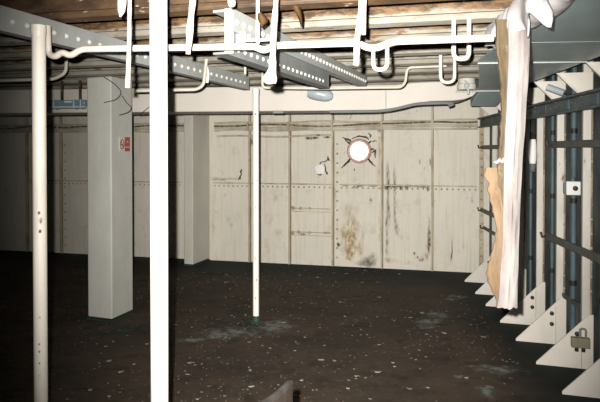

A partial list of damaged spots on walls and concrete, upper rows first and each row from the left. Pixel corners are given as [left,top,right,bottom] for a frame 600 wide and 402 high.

peeling [314,156,330,176]